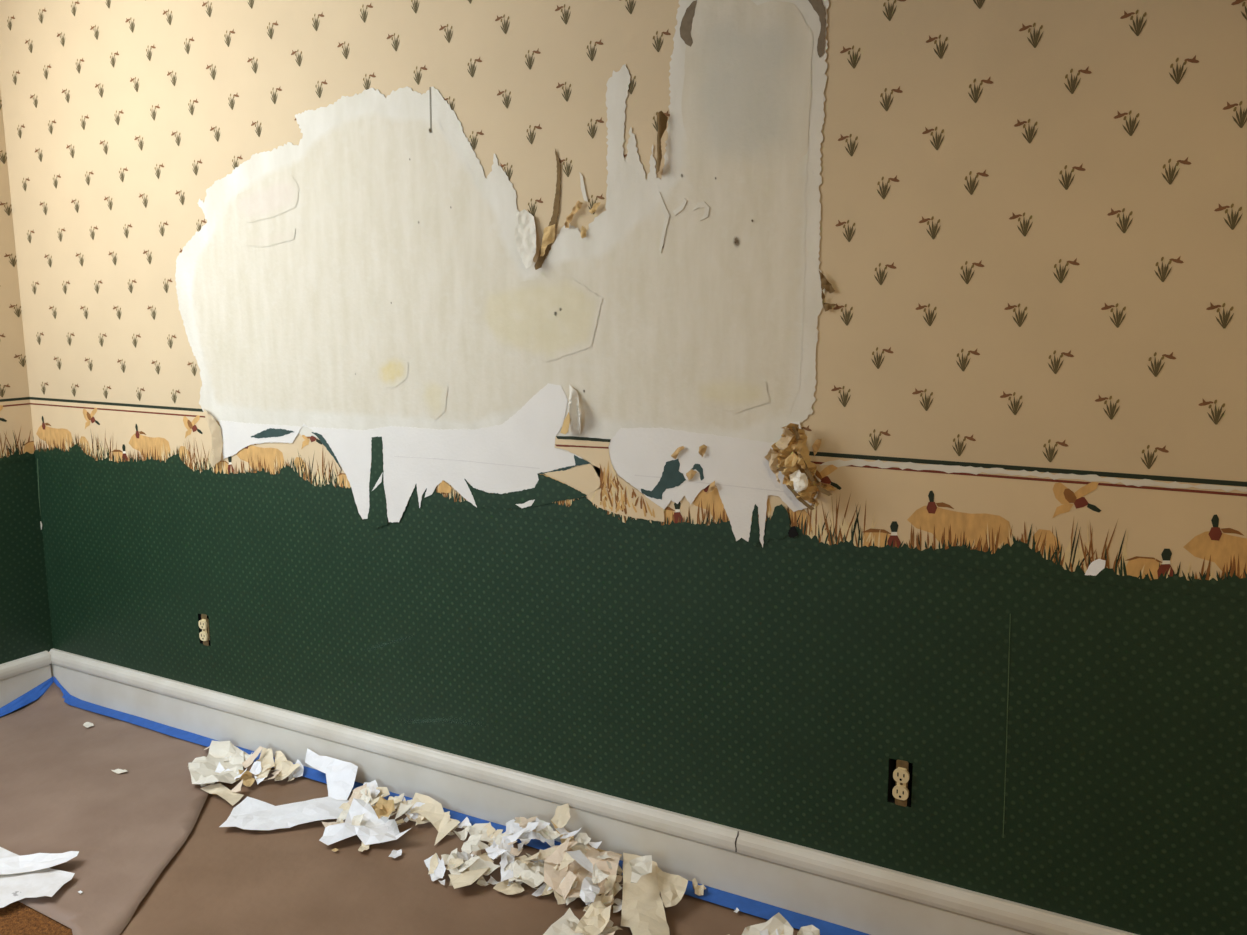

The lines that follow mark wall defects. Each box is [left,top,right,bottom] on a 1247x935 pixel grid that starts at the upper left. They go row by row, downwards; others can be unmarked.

spalling [680,0,697,47]
spalling [808,0,826,58]
flaking render [190,109,1247,547]